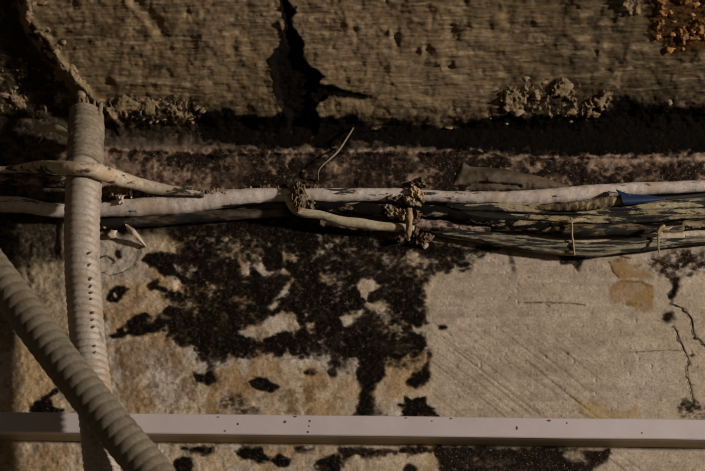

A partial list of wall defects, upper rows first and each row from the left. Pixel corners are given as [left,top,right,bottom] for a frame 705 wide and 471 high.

spalling [0,58,29,112]
spalling [16,0,92,112]
crack [267,0,372,135]
spalling [499,76,614,123]
water stain [107,217,501,417]
crack [672,304,705,410]
water stain [174,445,214,471]
water stain [235,445,292,467]
water stain [314,444,612,471]